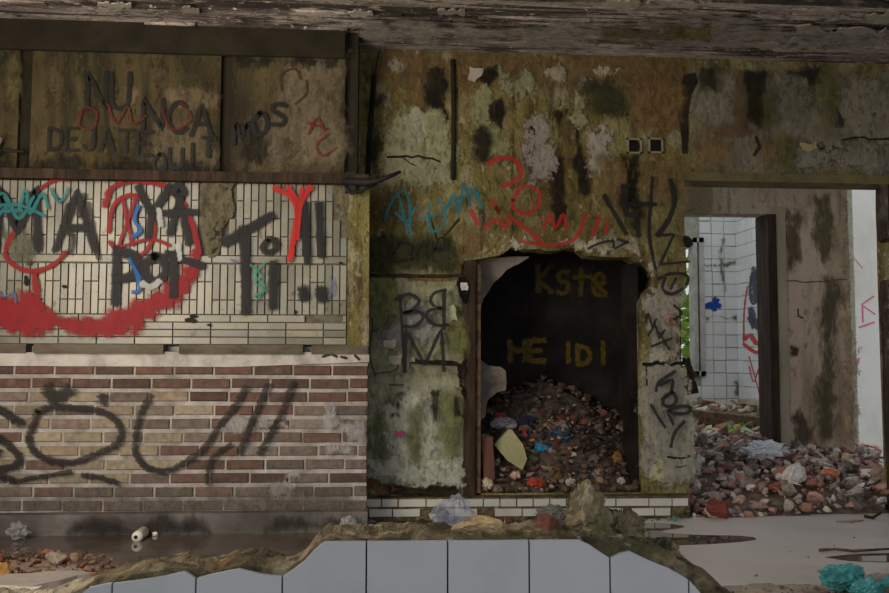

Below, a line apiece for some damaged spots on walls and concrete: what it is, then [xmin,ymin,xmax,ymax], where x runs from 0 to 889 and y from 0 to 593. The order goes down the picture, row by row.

peeling [97,1,132,10]
water stain [359,0,889,59]
peeling [757,10,889,52]
water stain [240,58,346,170]
crack [386,155,440,166]
water stain [472,98,505,163]
water stain [692,56,889,176]
peeling [462,236,526,257]
peeling [561,231,640,256]
water stain [323,270,468,487]
peeling [638,262,701,489]
water stain [813,277,845,440]